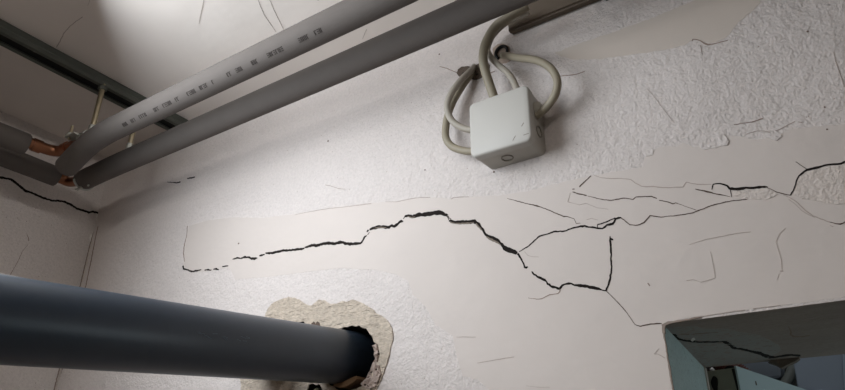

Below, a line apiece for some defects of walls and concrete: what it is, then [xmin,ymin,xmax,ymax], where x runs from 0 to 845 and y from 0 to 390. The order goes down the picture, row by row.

crack [0,176,98,288]
crack [182,161,845,359]
peeling [240,297,394,390]